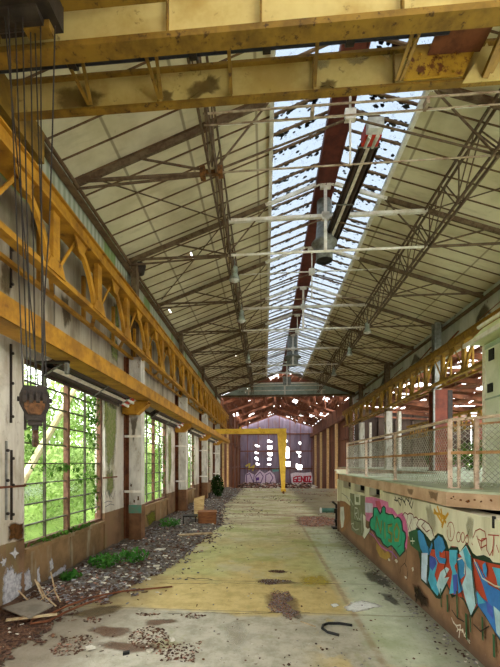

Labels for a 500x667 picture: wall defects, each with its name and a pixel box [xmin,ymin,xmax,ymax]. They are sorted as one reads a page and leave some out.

water stain [106,471,114,496]
peeling [0,548,22,605]